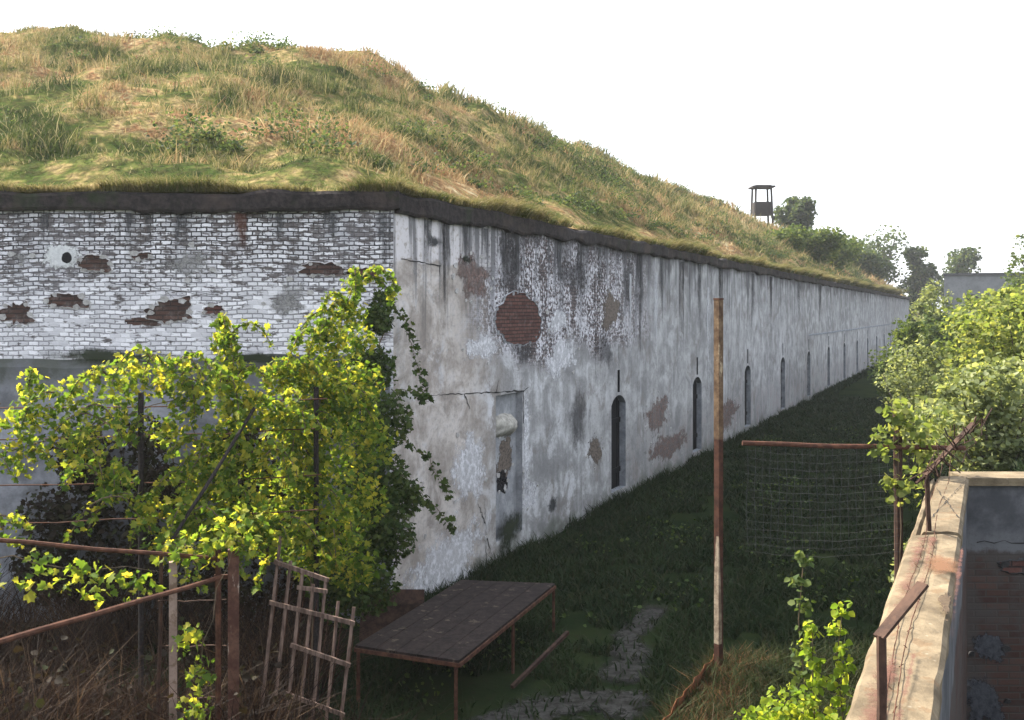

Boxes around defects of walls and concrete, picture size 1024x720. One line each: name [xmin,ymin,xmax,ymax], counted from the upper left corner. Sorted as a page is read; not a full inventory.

spalling [0,292,91,327]
spalling [125,241,226,326]
spalling [261,261,385,322]
leakage [424,218,450,262]
leakage [501,231,521,289]
spalling [462,290,580,379]
leakage [623,254,664,332]
leakage [698,264,723,334]
crack [432,381,529,423]
peeling [451,397,539,513]
rust [900,537,963,590]
rust [864,654,915,720]